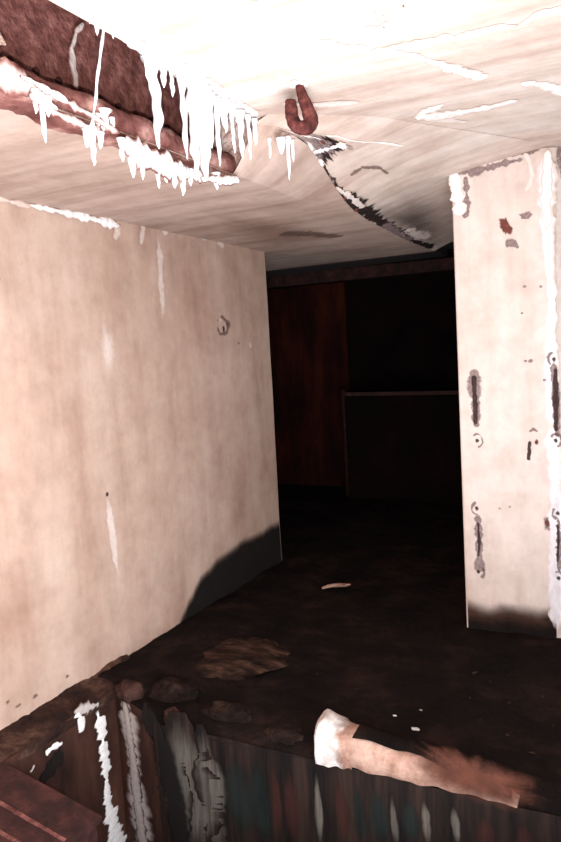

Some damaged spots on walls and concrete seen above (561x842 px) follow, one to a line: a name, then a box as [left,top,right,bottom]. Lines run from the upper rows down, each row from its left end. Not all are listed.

water stain [68,22,85,90]
water stain [0,57,221,195]
spalling [458,149,538,177]
water stain [523,149,561,632]
water stain [45,741,63,756]
water stain [73,699,298,842]